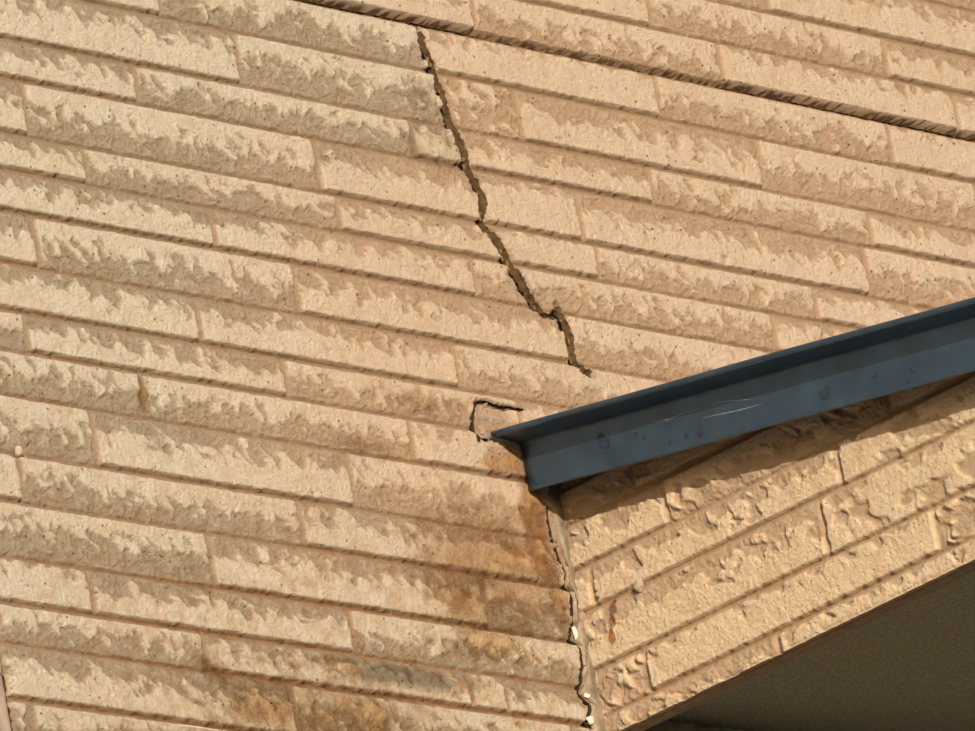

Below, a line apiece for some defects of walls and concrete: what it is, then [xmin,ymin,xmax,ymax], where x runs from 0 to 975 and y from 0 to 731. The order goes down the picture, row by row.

crack [417,31,592,378]
crack [470,401,524,442]
crack [546,506,594,730]